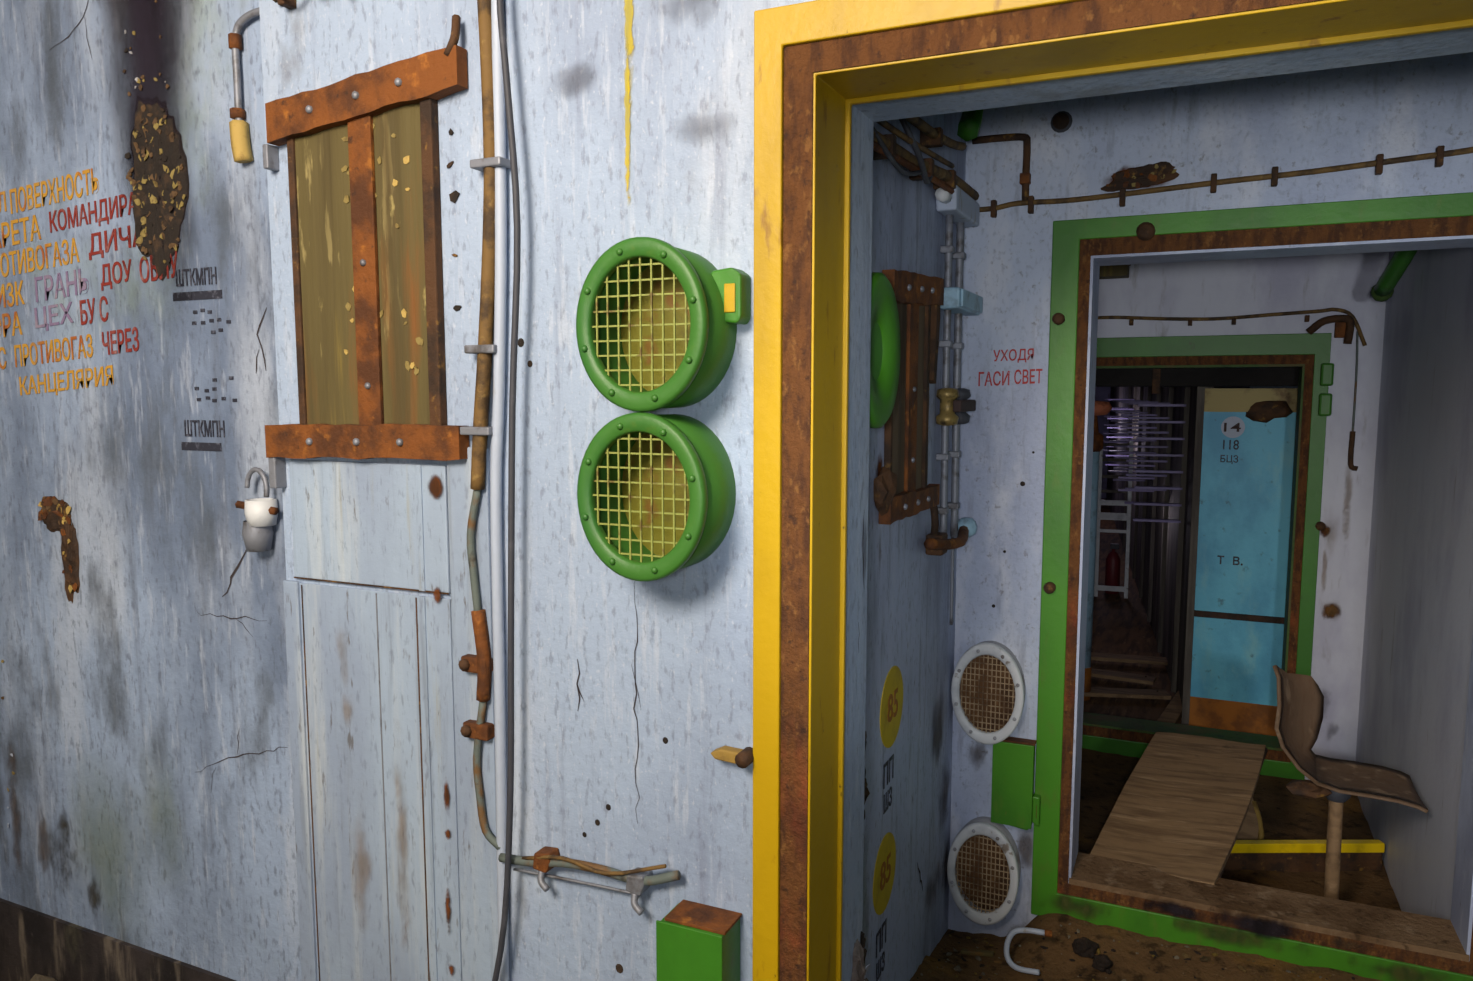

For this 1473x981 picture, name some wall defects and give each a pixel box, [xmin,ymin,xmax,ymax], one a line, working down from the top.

corrosion [60,516,80,603]
damp [11,795,19,839]
damp [40,819,67,880]
damp [89,884,99,907]